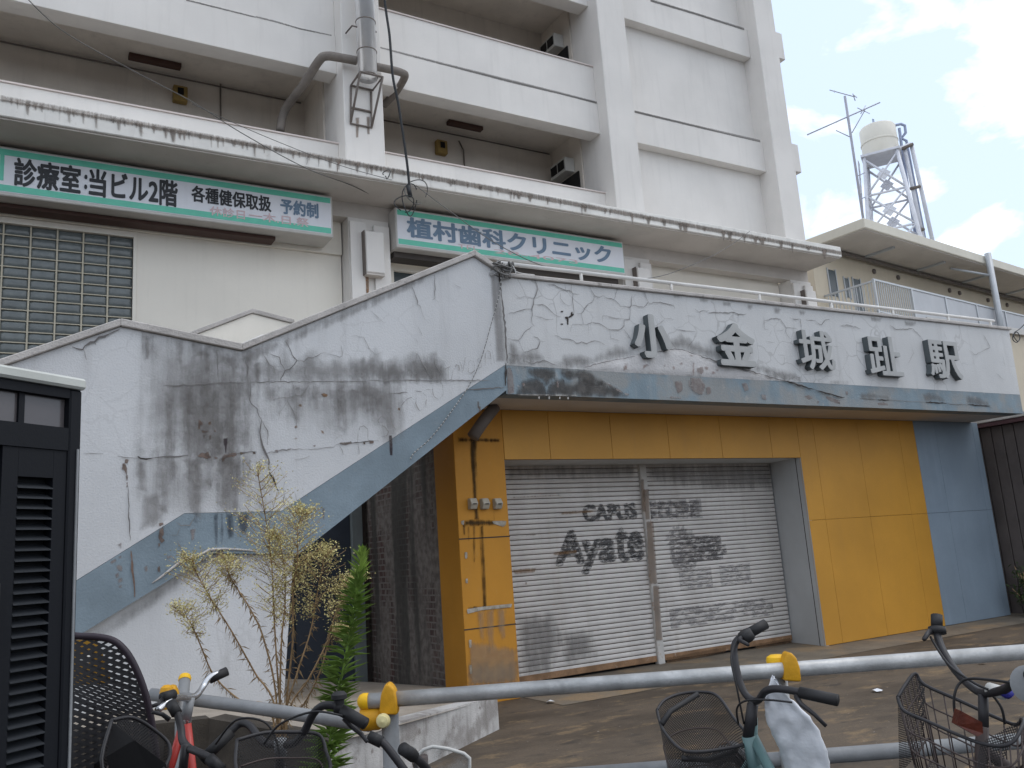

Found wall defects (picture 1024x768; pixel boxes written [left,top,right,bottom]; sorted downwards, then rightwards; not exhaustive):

water stain [1,96,842,259]
water stain [517,356,621,399]
crack [164,274,987,502]
crack [89,452,188,460]
crack [127,490,135,597]